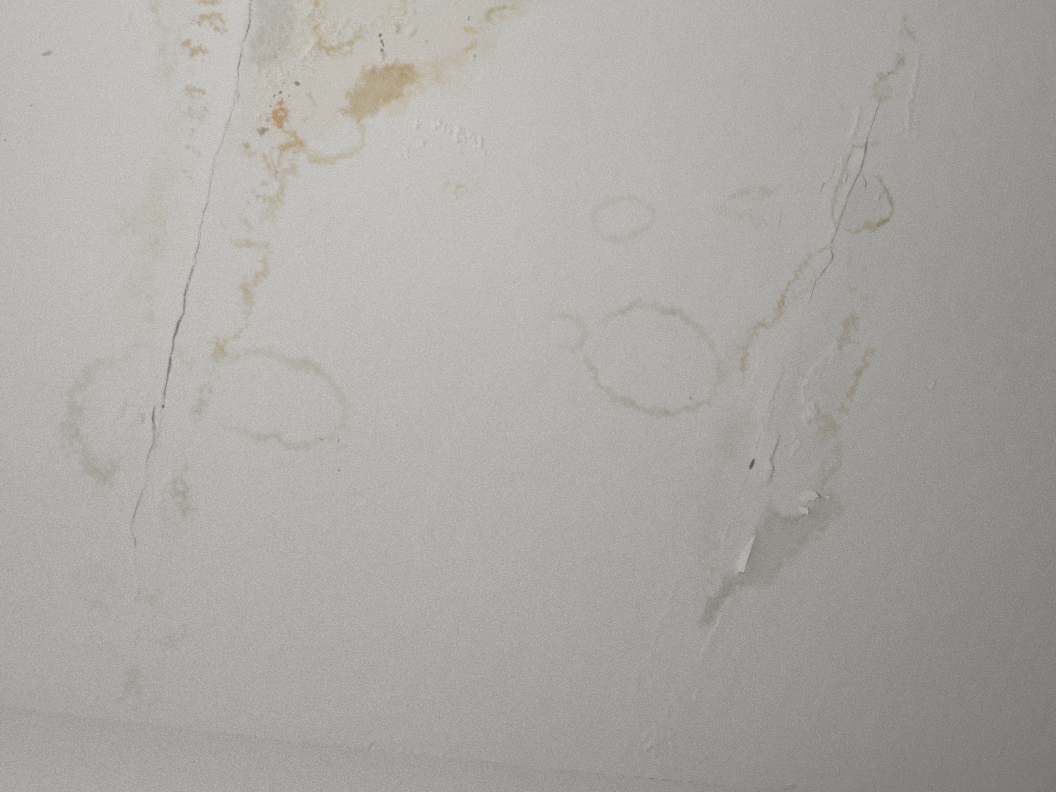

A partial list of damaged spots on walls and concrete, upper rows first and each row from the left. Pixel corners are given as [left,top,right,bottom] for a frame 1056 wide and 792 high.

leakage [52,0,223,501]
crack [117,0,253,602]
leakage [211,342,354,453]
leakage [219,0,556,231]
leakage [582,137,897,421]
crack [798,97,881,338]